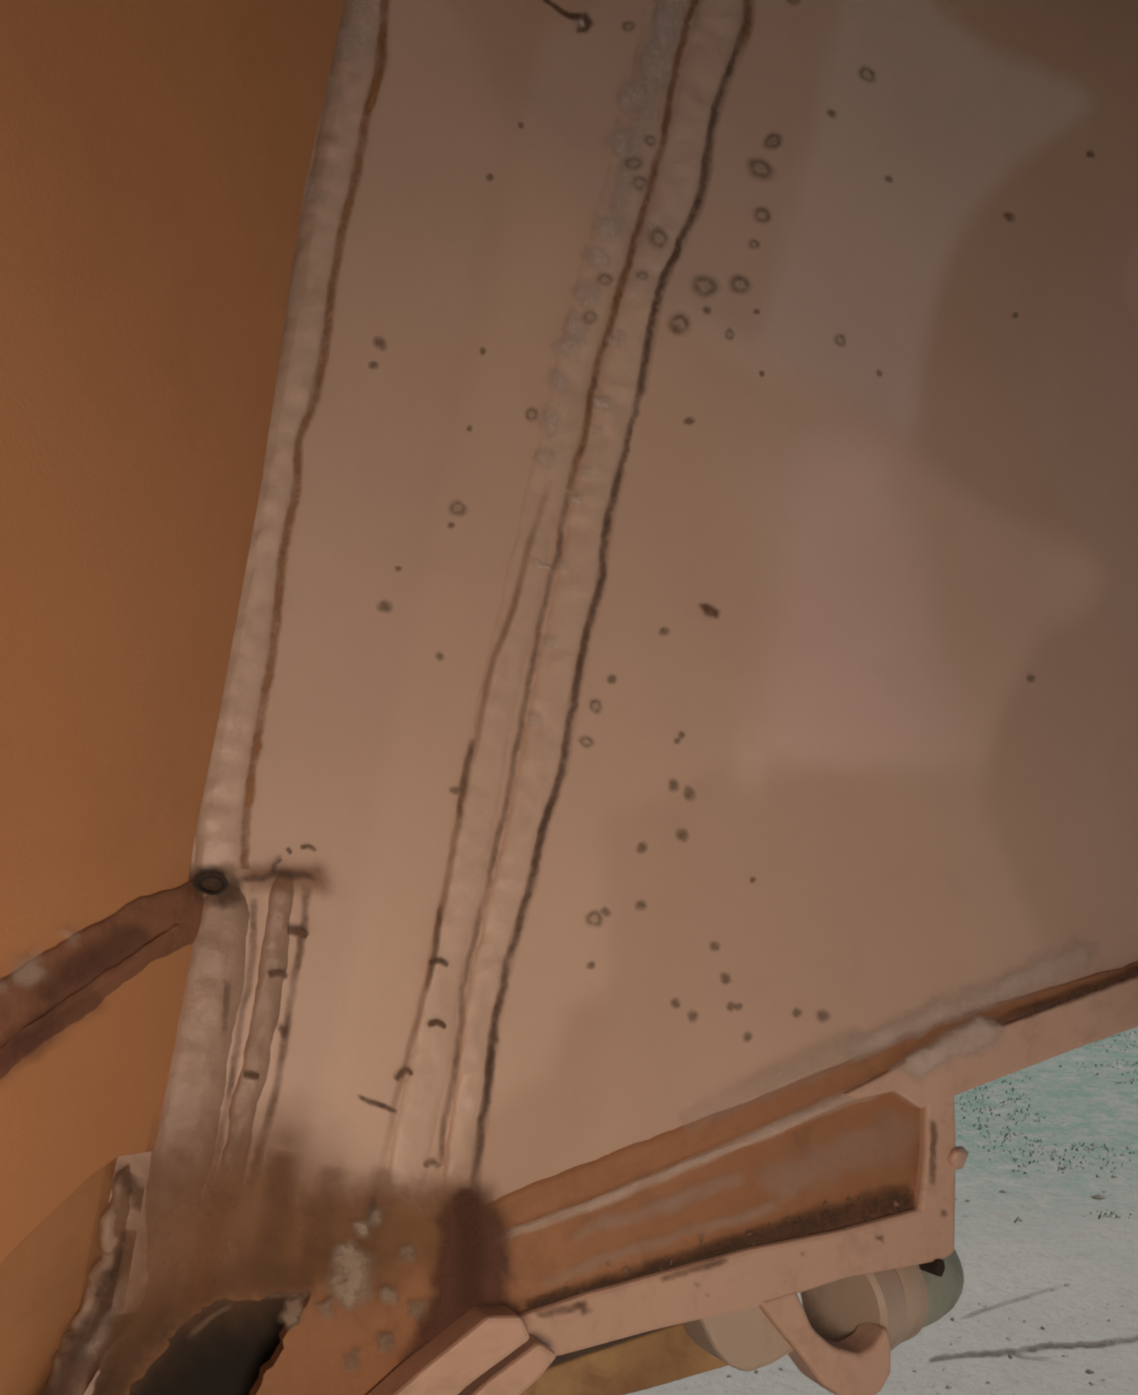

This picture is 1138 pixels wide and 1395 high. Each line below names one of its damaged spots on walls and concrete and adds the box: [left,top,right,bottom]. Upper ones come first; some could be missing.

crack [510,49,737,953]
crack [479,989,504,1129]